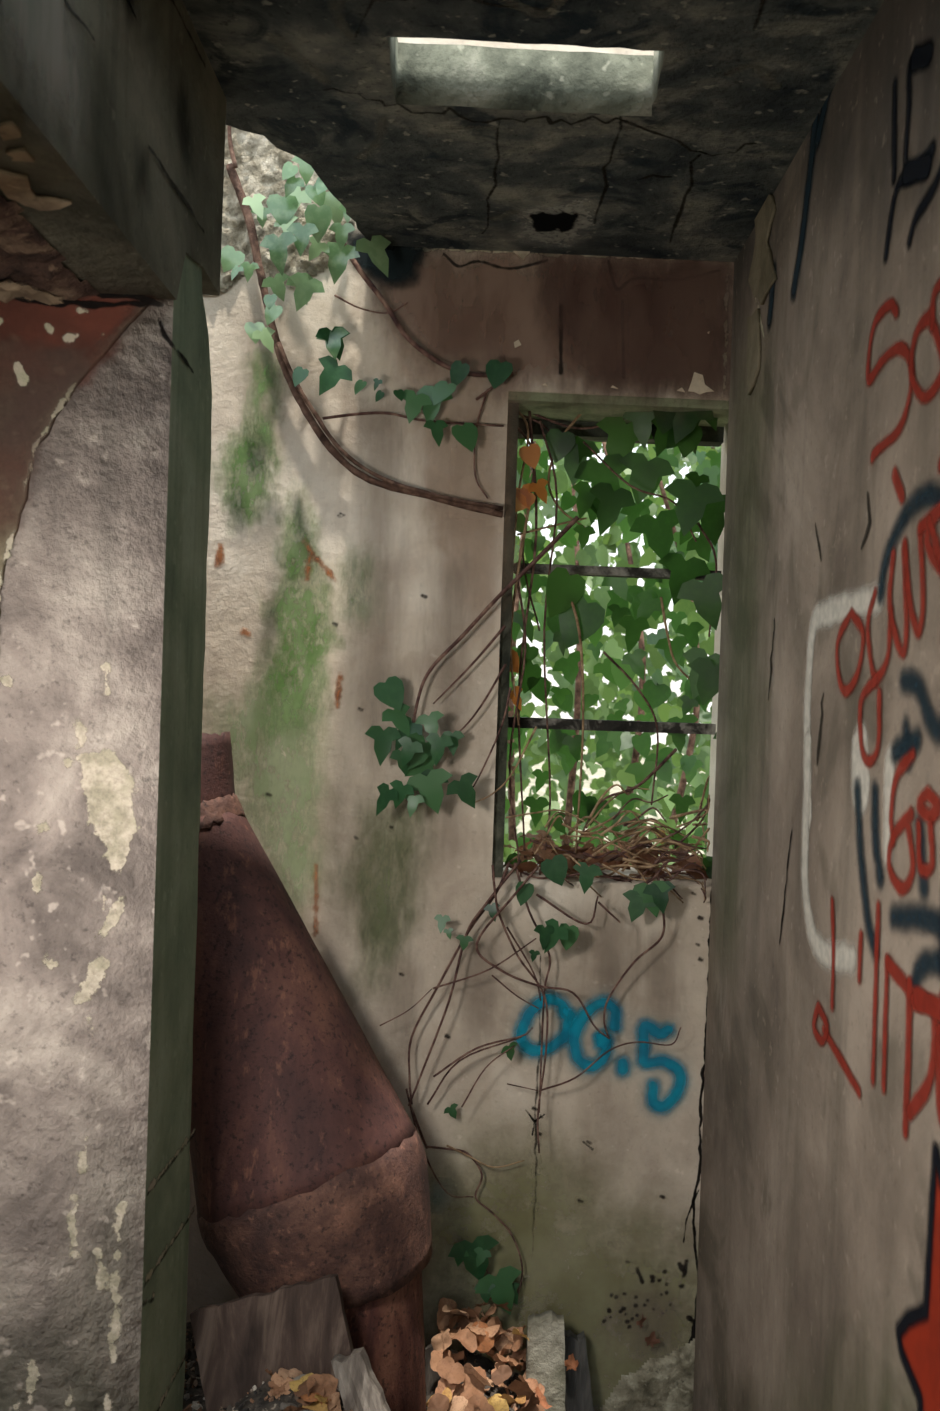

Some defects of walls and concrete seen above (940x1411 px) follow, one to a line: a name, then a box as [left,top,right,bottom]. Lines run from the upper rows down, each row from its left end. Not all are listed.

crack [64,0,95,41]
crack [269,35,757,242]
crack [148,146,204,233]
flaking render [0,121,148,617]
leakage [283,507,317,580]
peeling [63,721,141,871]
peeling [31,872,43,893]
peeling [98,896,125,937]
peeling [73,956,110,1030]
peeling [66,1194,128,1363]
peeling [13,1360,41,1410]
peeling [103,1394,113,1411]